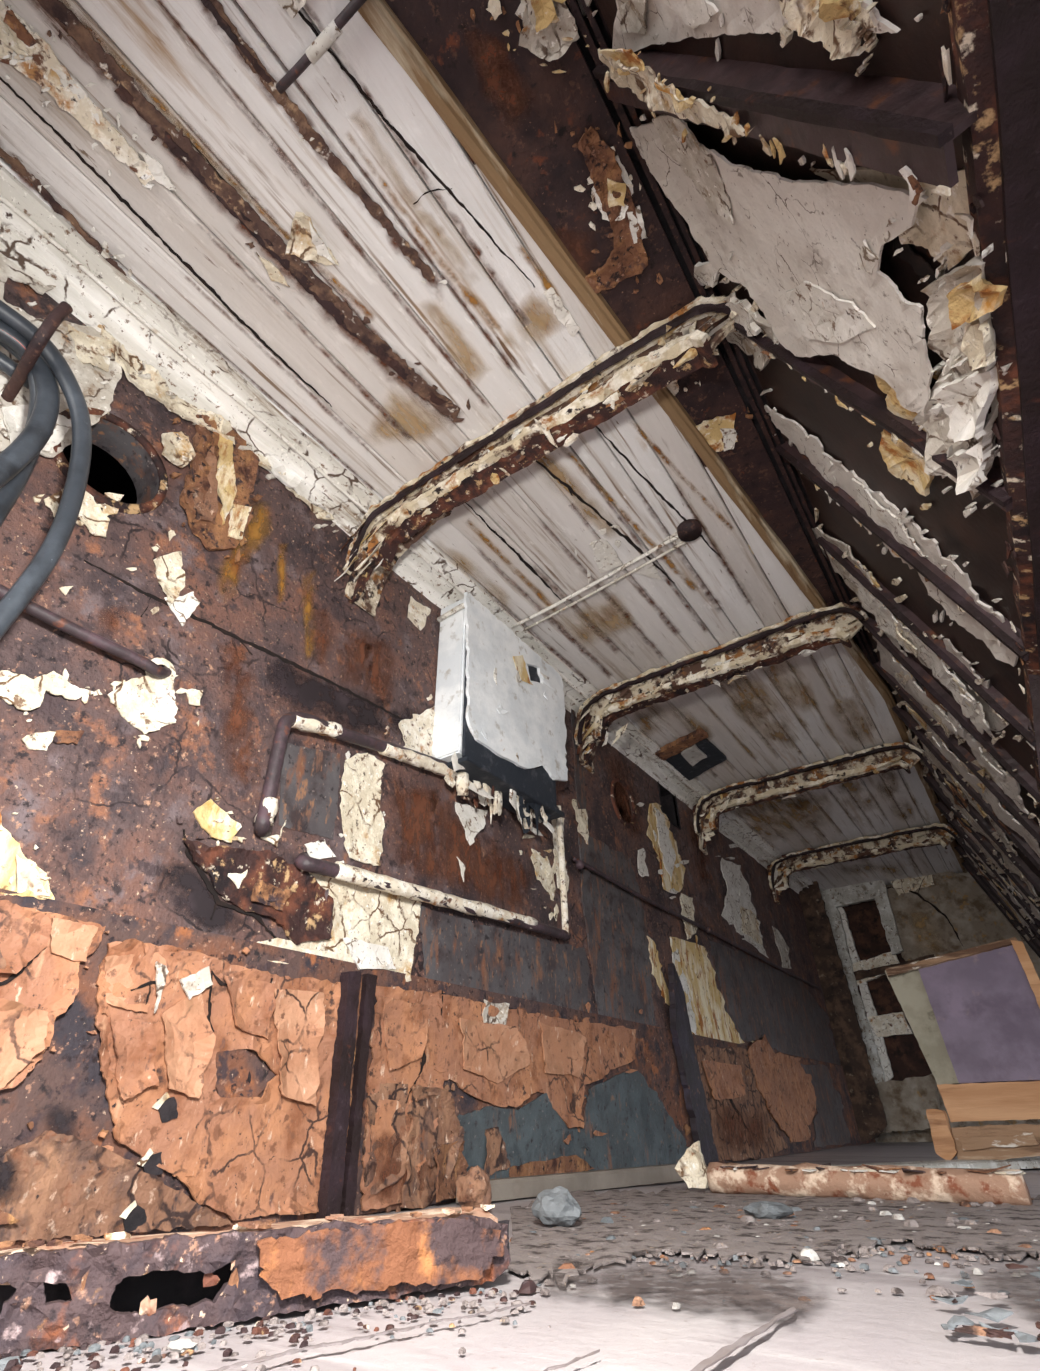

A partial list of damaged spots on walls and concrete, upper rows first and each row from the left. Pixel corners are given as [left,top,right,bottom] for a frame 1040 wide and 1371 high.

spalling [0,0,471,423]
corrosion [389,236,509,366]
peeling [470,0,1012,518]
peeling [0,253,399,582]
peeling [696,388,1040,941]
peeling [0,743,840,1242]
corrosion [139,1295,157,1316]
corrosion [203,1260,239,1304]
corrosion [232,1204,504,1300]
crack [207,1302,531,1371]
crack [543,1349,600,1371]
crack [690,1306,797,1371]